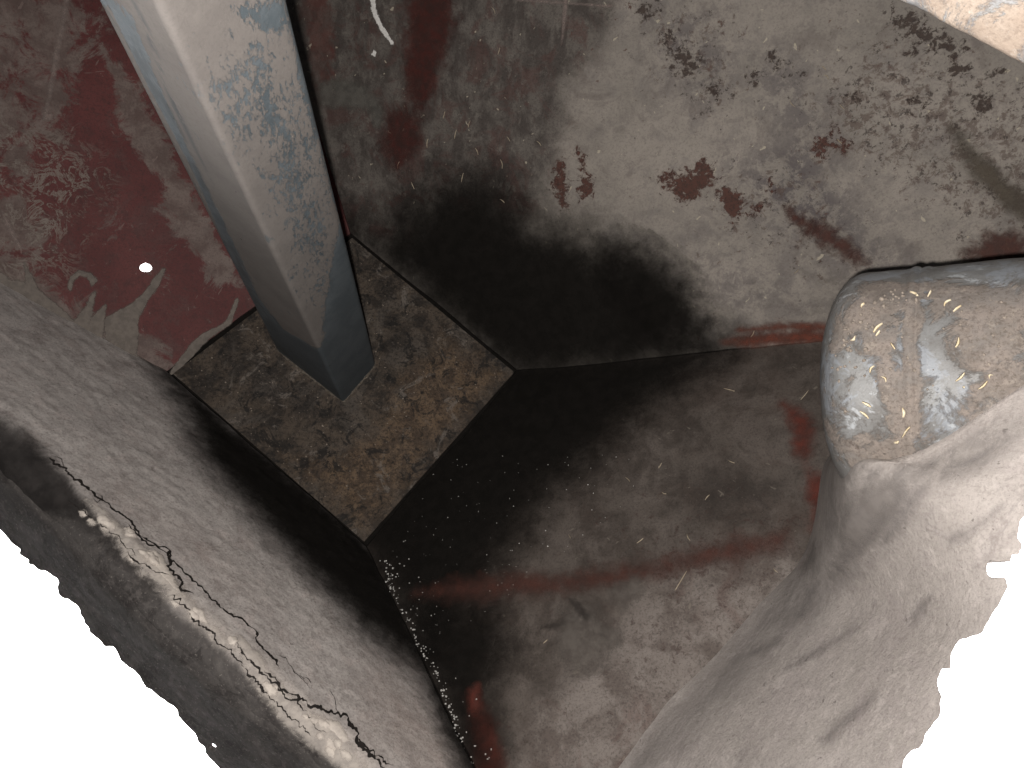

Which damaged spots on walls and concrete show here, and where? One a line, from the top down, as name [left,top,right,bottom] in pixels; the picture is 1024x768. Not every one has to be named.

corrosion [787,209,864,265]
corrosion [729,323,825,347]
leakage [158,173,735,768]
crack [47,455,388,768]
corrosion [471,685,501,768]